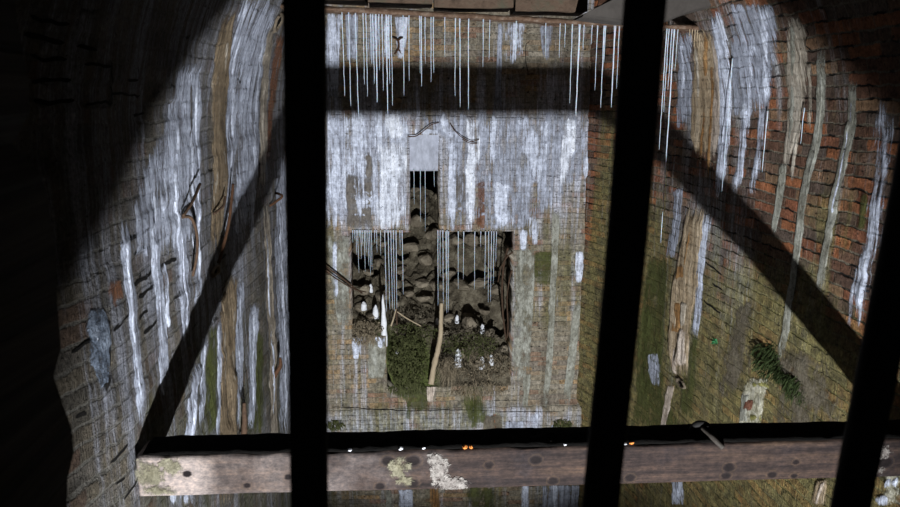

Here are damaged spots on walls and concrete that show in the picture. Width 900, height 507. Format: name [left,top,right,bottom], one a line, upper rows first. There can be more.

spalling [87,309,112,392]
leakage [120,223,146,422]
leakage [152,0,274,395]
leakage [185,156,289,435]
leakage [346,116,410,228]
leakage [455,118,480,228]
leakage [560,118,576,185]
peeling [669,302,689,366]
leakage [693,214,711,332]
leakage [699,12,755,197]
leakage [772,18,826,355]
leakage [816,86,856,287]